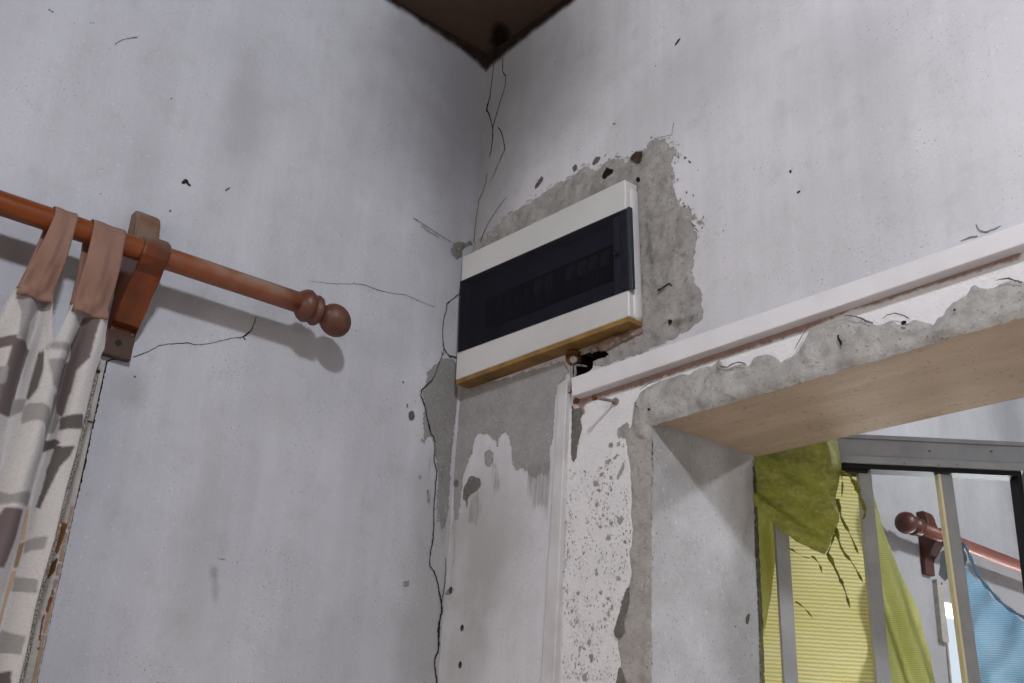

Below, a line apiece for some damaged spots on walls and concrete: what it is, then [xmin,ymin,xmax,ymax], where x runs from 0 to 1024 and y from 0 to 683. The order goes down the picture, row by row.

crack [37,318,256,683]
crack [473,58,506,243]
spalling [407,134,707,529]
spalling [561,406,631,682]